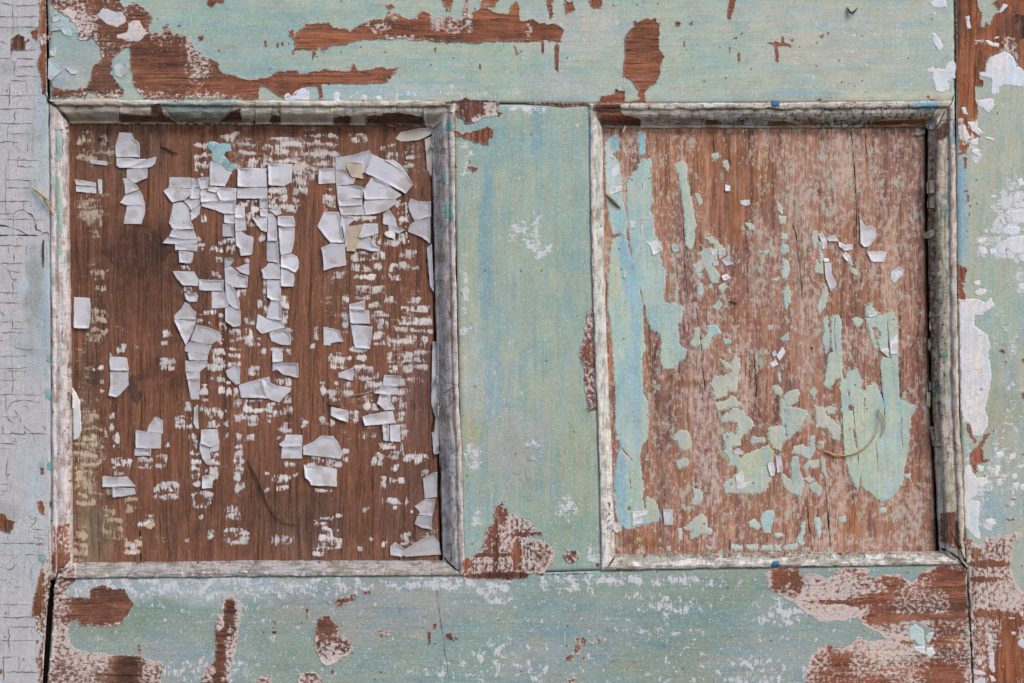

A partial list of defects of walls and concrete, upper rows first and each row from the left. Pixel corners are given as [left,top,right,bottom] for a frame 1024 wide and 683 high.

peeling [10,0,575,224]
peeling [526,18,665,126]
peeling [870,0,1024,169]
crack [0,3,94,490]
peeling [163,161,299,489]
peeling [318,150,434,291]
crack [2,516,70,682]
peeling [31,500,163,683]
peeling [279,434,343,487]
peeling [390,472,441,557]
peeling [463,499,600,585]
peeling [763,263,1024,683]